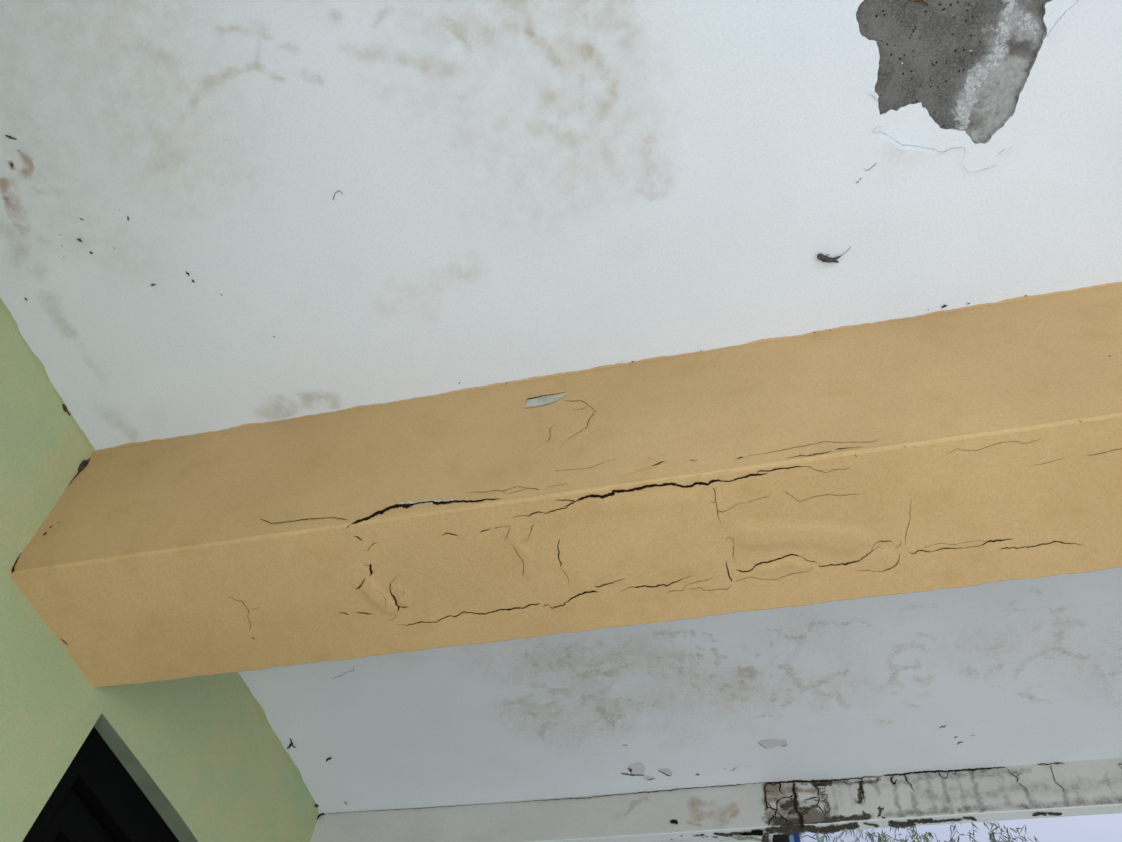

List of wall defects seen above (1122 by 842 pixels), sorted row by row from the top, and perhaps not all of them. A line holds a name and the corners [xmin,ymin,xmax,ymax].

spalling [856,0,1095,192]
peeling [525,392,566,408]
crack [261,440,1079,626]
peeling [621,763,672,780]
crack [327,762,1064,828]